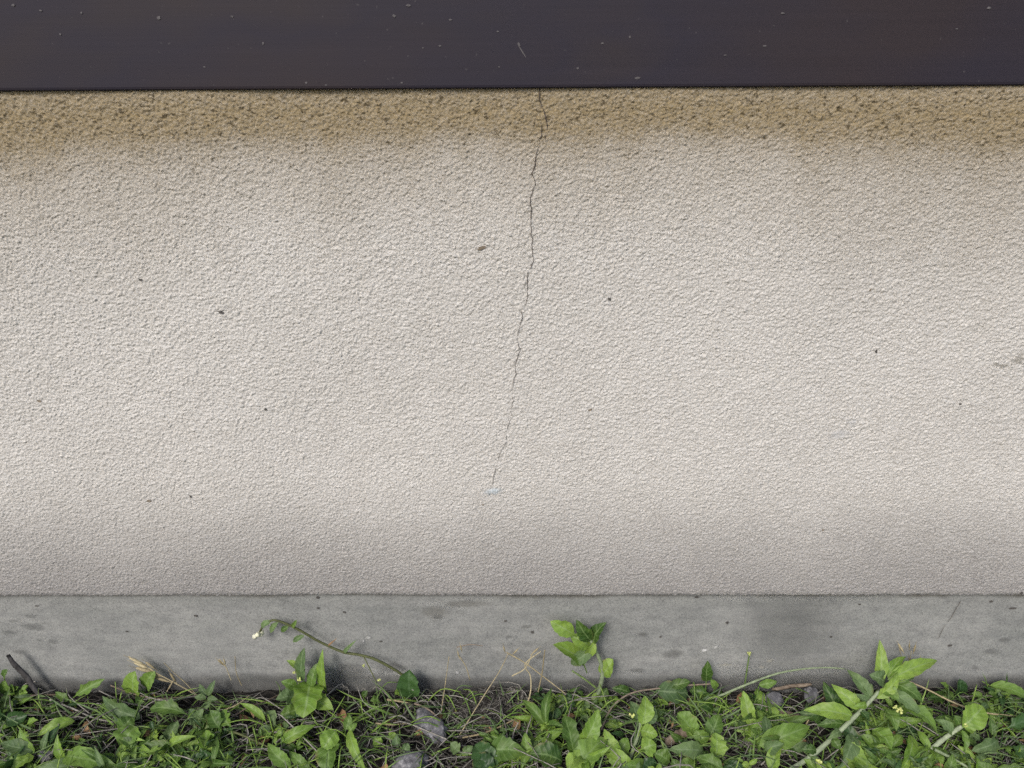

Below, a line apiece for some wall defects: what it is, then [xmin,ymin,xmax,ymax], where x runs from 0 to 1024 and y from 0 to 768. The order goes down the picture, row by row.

damp [0,85,1024,167]
crack [492,88,548,484]